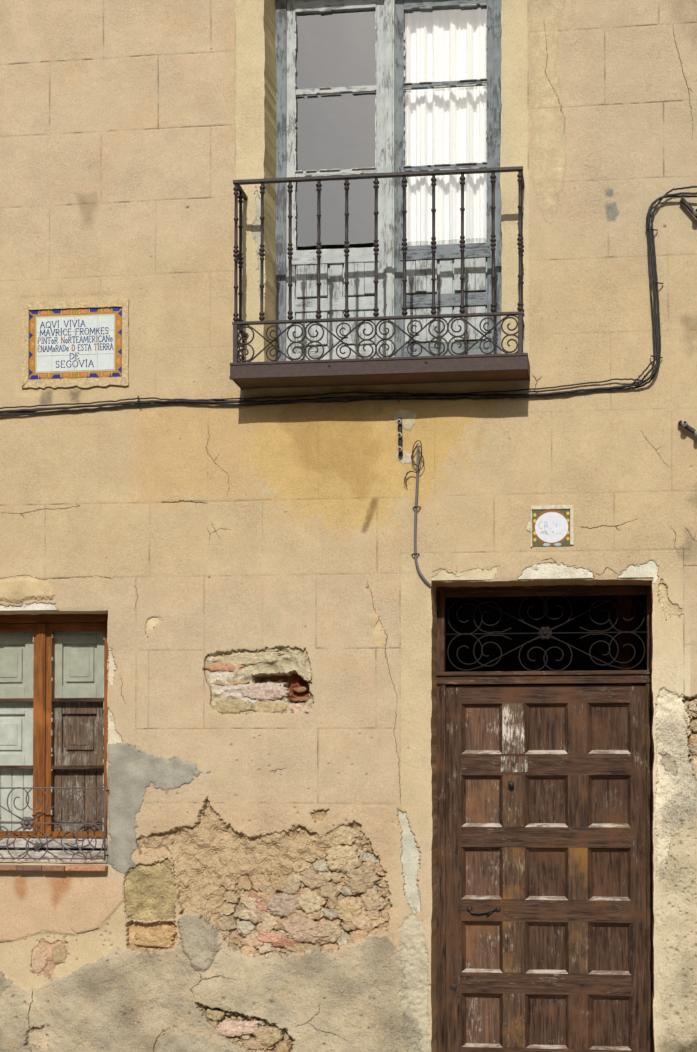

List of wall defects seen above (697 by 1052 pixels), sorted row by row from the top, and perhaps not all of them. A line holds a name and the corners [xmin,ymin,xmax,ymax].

crack [162,500,229,539]
peeling [431,566,500,580]
peeling [518,563,594,579]
peeling [618,561,683,620]
spalling [204,647,314,714]
spalling [683,696,697,766]
peeling [658,750,677,775]
spalling [125,799,392,958]
peeling [398,810,421,913]
spalling [31,939,68,979]
spalling [198,1003,295,1052]